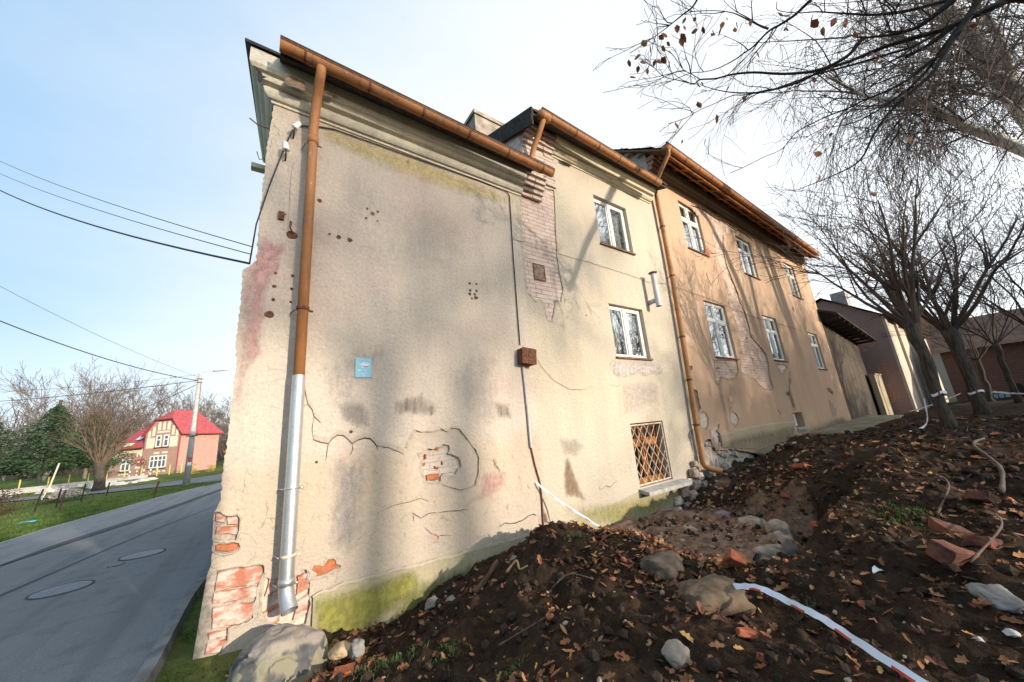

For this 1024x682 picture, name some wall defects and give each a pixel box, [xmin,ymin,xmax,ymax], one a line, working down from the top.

spalling [519,186,565,322]
spalling [690,204,787,391]
crack [706,273,790,412]
crack [304,387,404,484]
crack [382,477,473,536]
peeling [404,425,481,498]
leakage [565,461,580,495]
spalling [193,510,345,660]